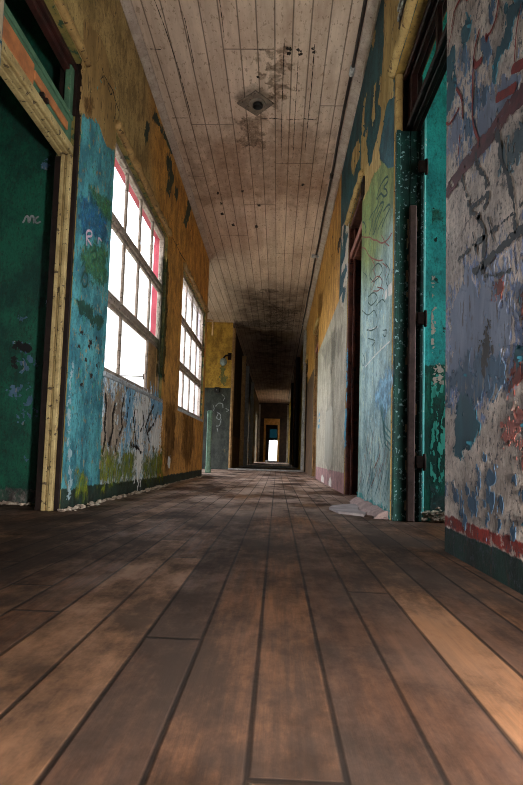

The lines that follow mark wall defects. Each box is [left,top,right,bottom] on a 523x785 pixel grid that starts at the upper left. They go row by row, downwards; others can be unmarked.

peeling [447,0,523,163]
peeling [497,121,523,178]
peeling [5,384,38,425]
peeling [66,331,170,500]
peeling [430,251,523,542]